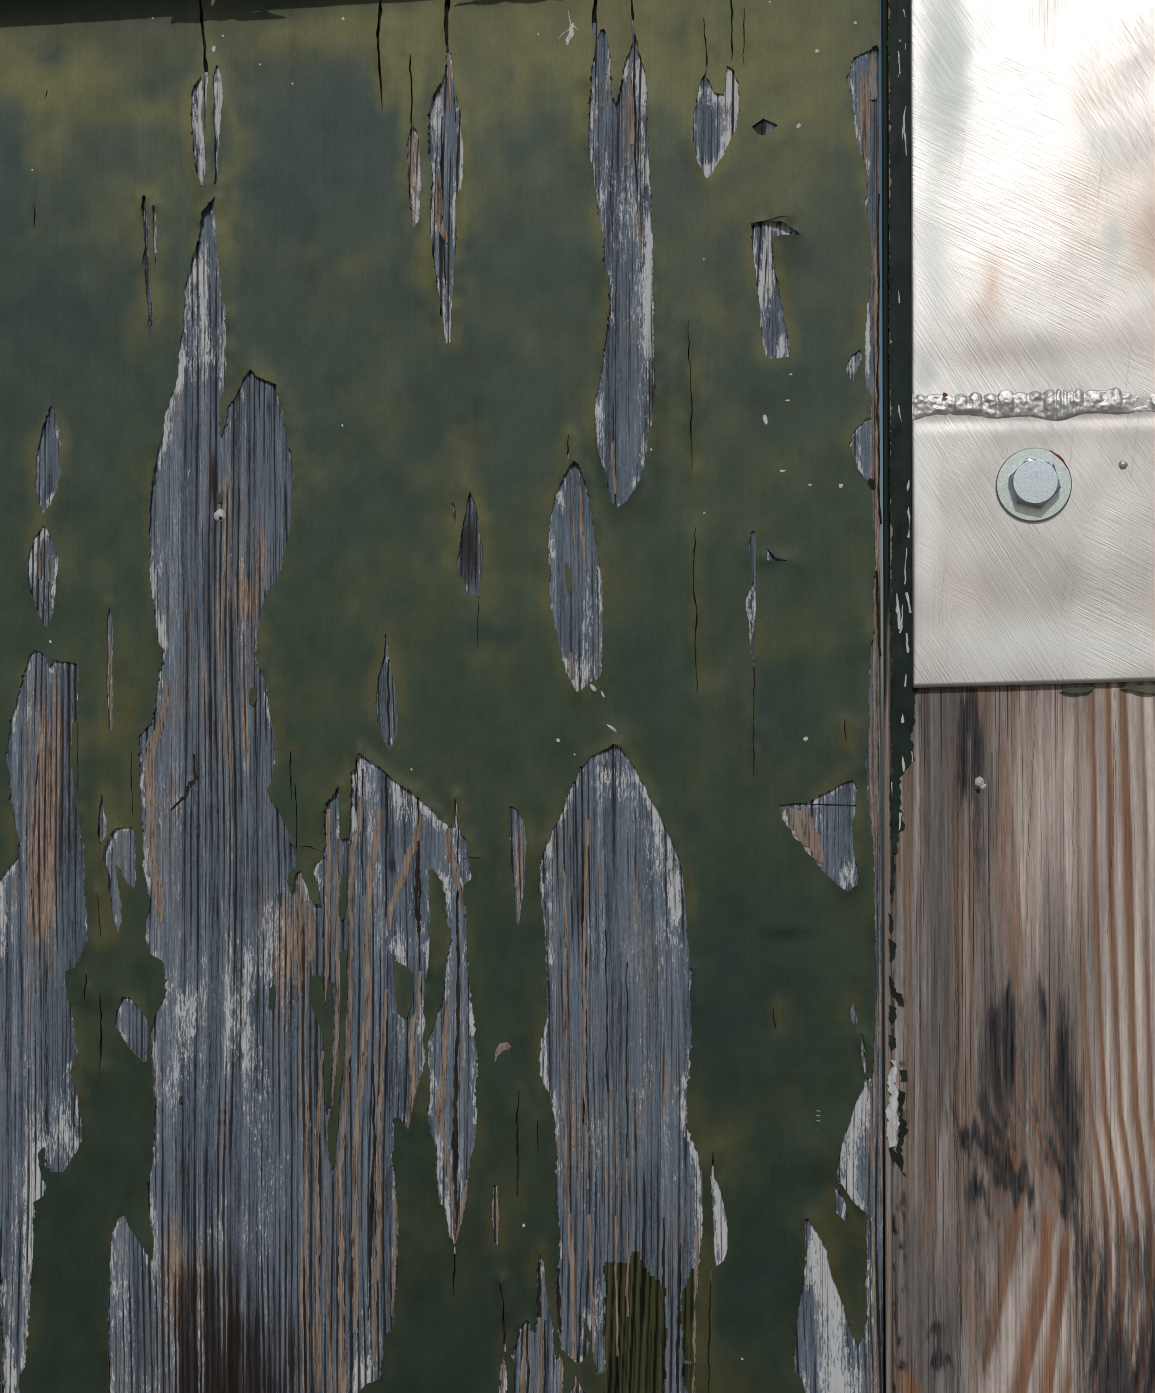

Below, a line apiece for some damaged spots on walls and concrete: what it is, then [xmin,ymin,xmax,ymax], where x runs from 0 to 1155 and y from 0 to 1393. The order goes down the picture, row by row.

crack [199,0,208,96]
crack [376,0,413,127]
crack [443,0,451,46]
crack [592,0,600,63]
peeling [588,20,656,507]
peeling [751,216,799,359]
peeling [547,454,603,692]
peeling [0,35,484,1393]
peeling [779,0,919,1393]
peeling [498,744,728,1393]
damp [947,983,1034,1216]
damp [1035,981,1155,1393]